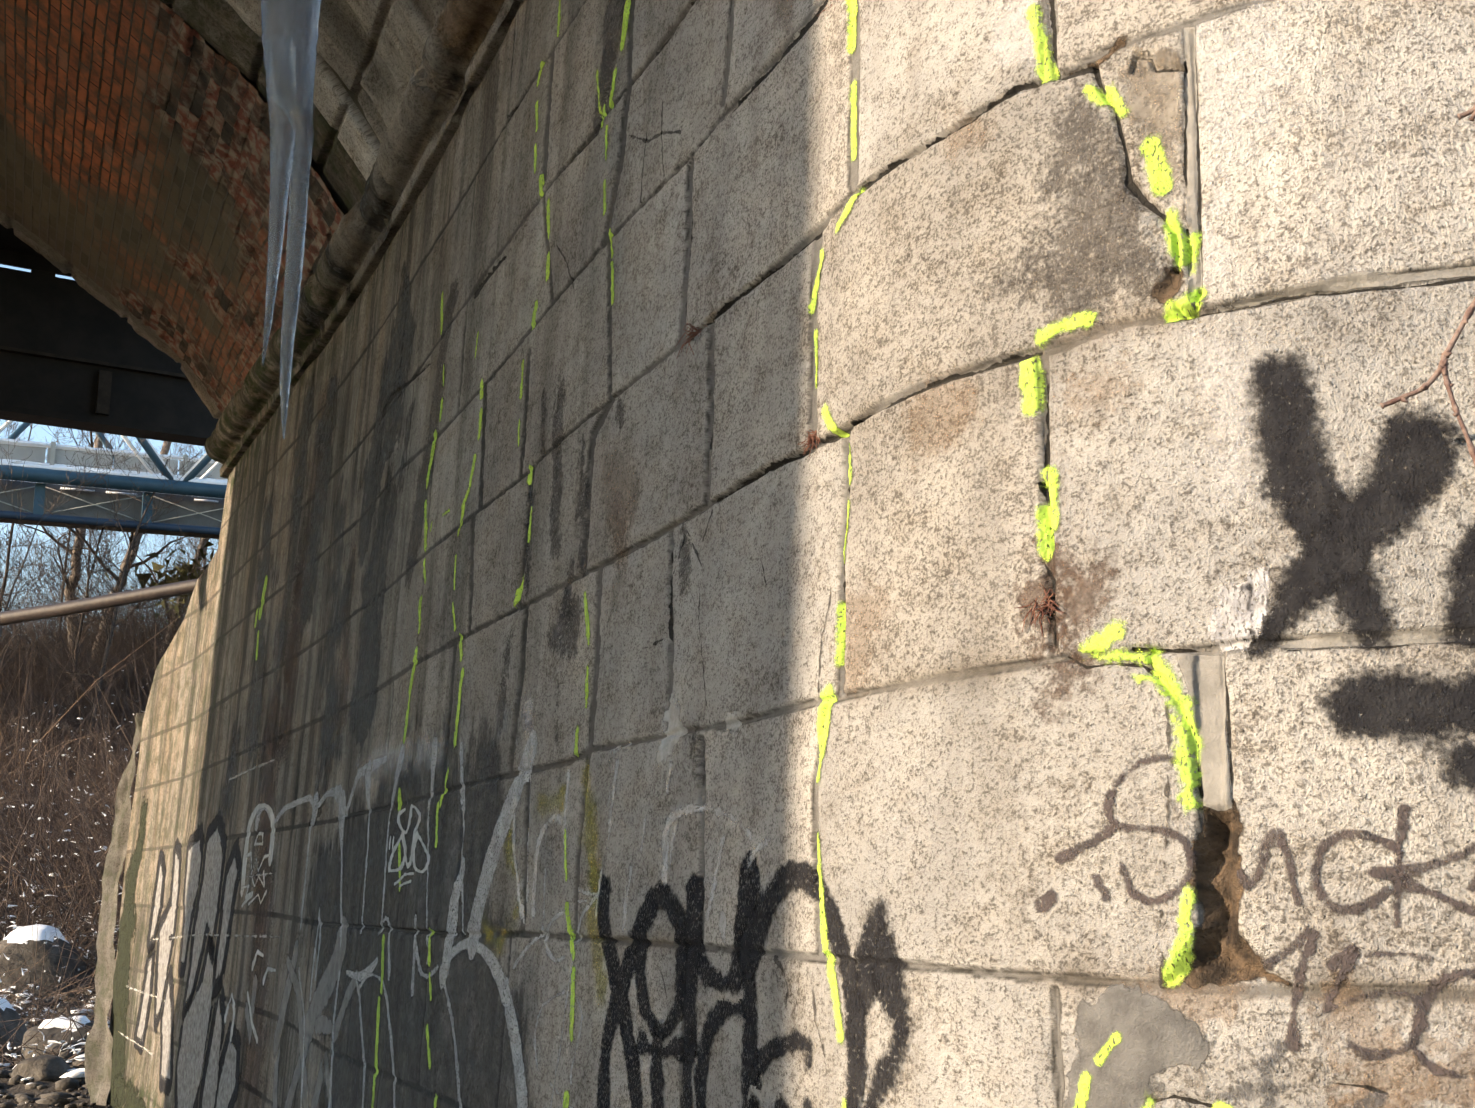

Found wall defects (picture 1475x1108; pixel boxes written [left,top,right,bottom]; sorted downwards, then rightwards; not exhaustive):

crack [1062,57,1475,320]
leakage [218,261,459,829]
leakage [497,630,513,734]
crack [1068,647,1234,865]
crack [1158,954,1166,988]
spalling [1164,800,1291,989]